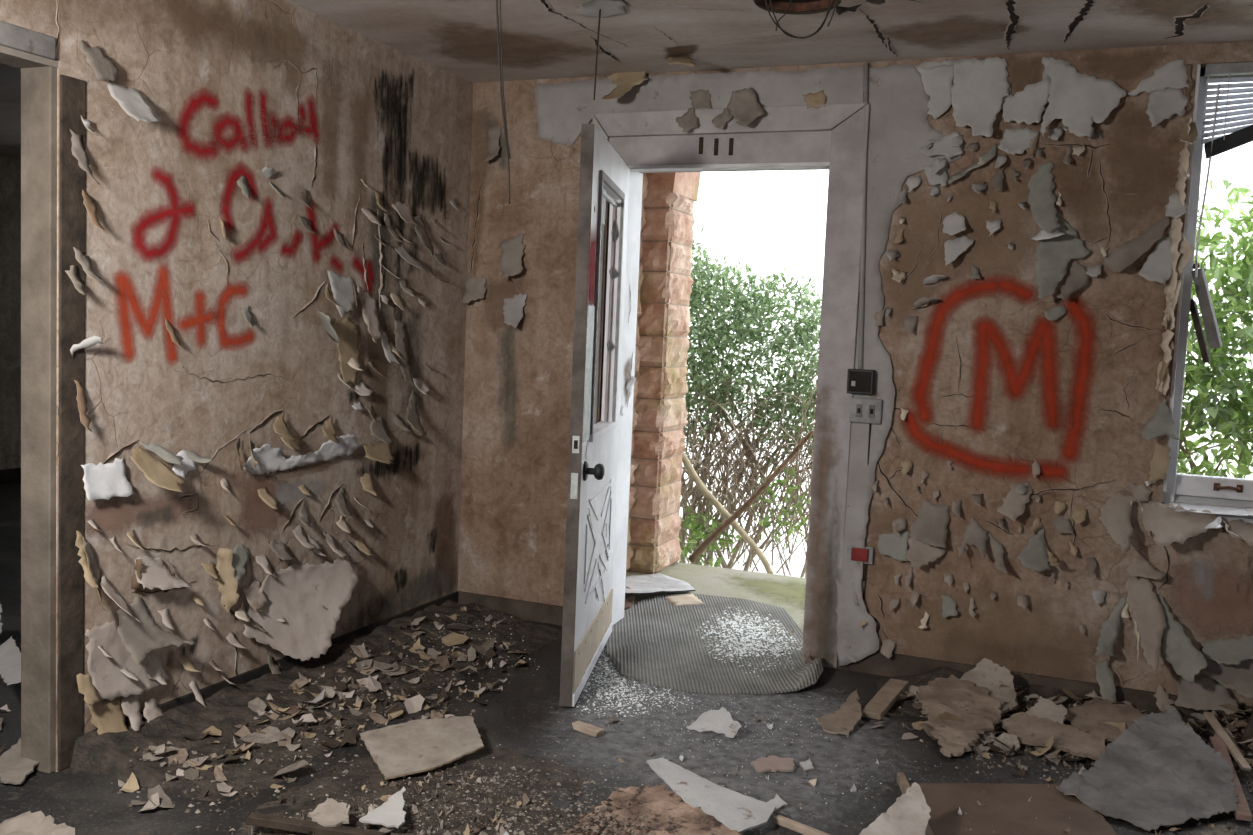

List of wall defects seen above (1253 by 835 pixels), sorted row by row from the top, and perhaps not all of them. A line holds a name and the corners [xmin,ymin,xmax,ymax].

crack [859,9,898,57]
crack [1003,0,1021,49]
crack [1063,0,1097,43]
crack [1164,3,1210,39]
peeling [69,115,105,230]
peeling [65,247,107,295]
water stain [354,70,446,426]
peeling [534,46,1253,715]
peeling [70,176,469,744]
peeling [143,746,209,768]
spalling [816,689,884,736]
peeling [972,713,1020,757]